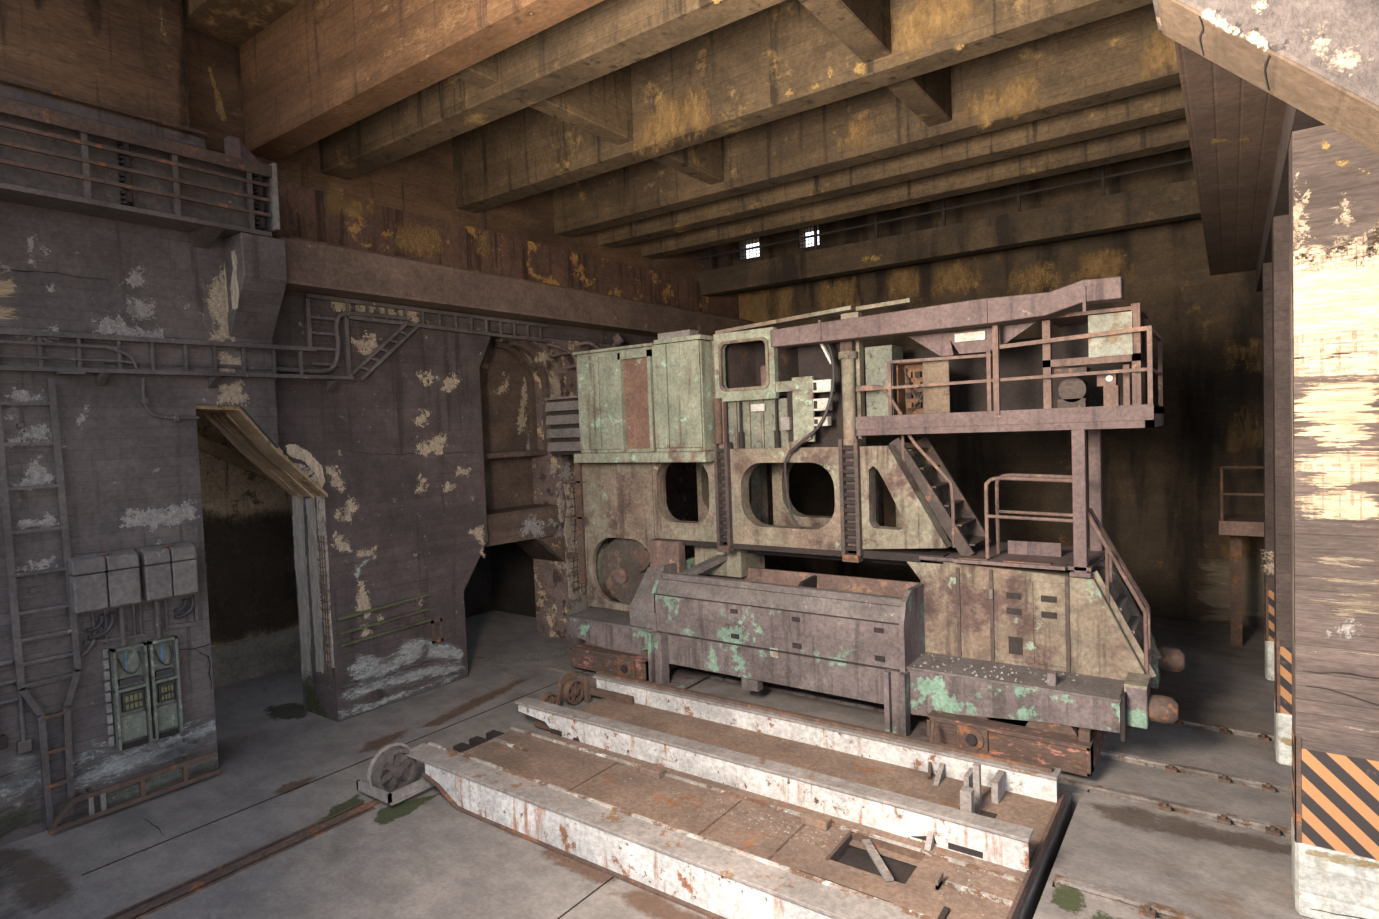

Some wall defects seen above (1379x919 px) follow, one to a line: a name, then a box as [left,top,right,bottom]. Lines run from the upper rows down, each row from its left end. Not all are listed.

spalling [1202,0,1269,51]
peeling [90,294,166,343]
peeling [202,250,250,412]
peeling [1291,172,1379,660]
peeling [116,499,200,545]
peeling [269,444,378,688]
peeling [355,578,384,638]
water stain [338,637,567,718]
corrosion [545,849,609,883]
corrosion [623,892,713,919]